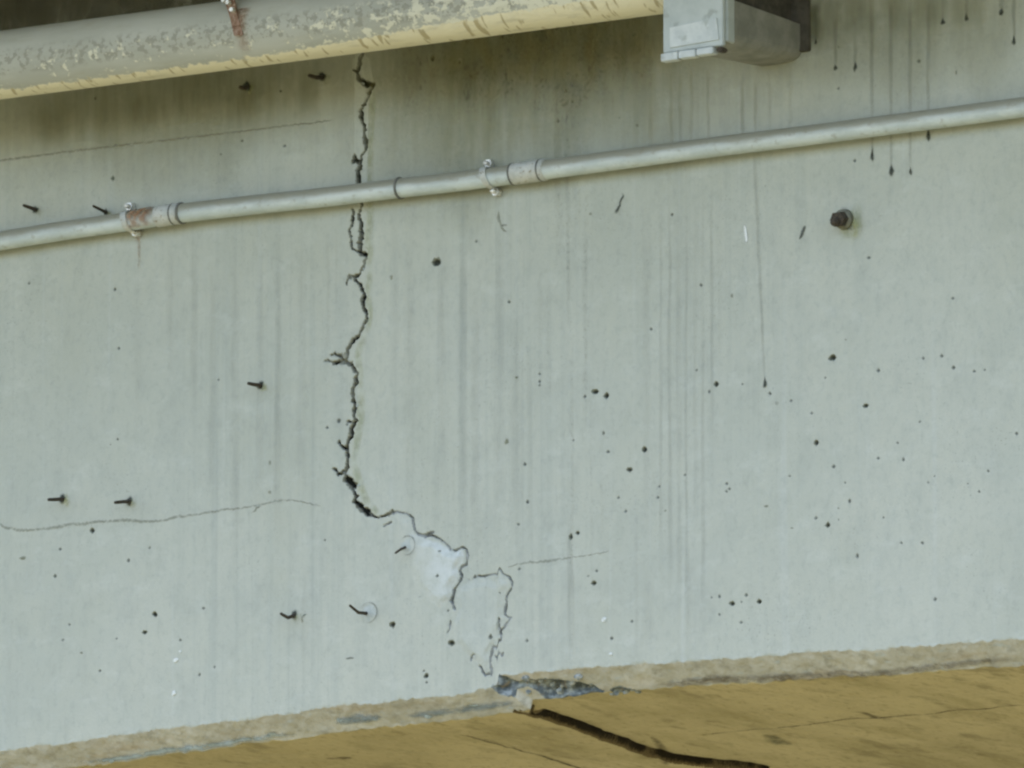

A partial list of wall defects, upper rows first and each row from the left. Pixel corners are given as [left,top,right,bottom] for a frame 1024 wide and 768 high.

crack [325,53,513,677]
spalling [416,674,642,719]